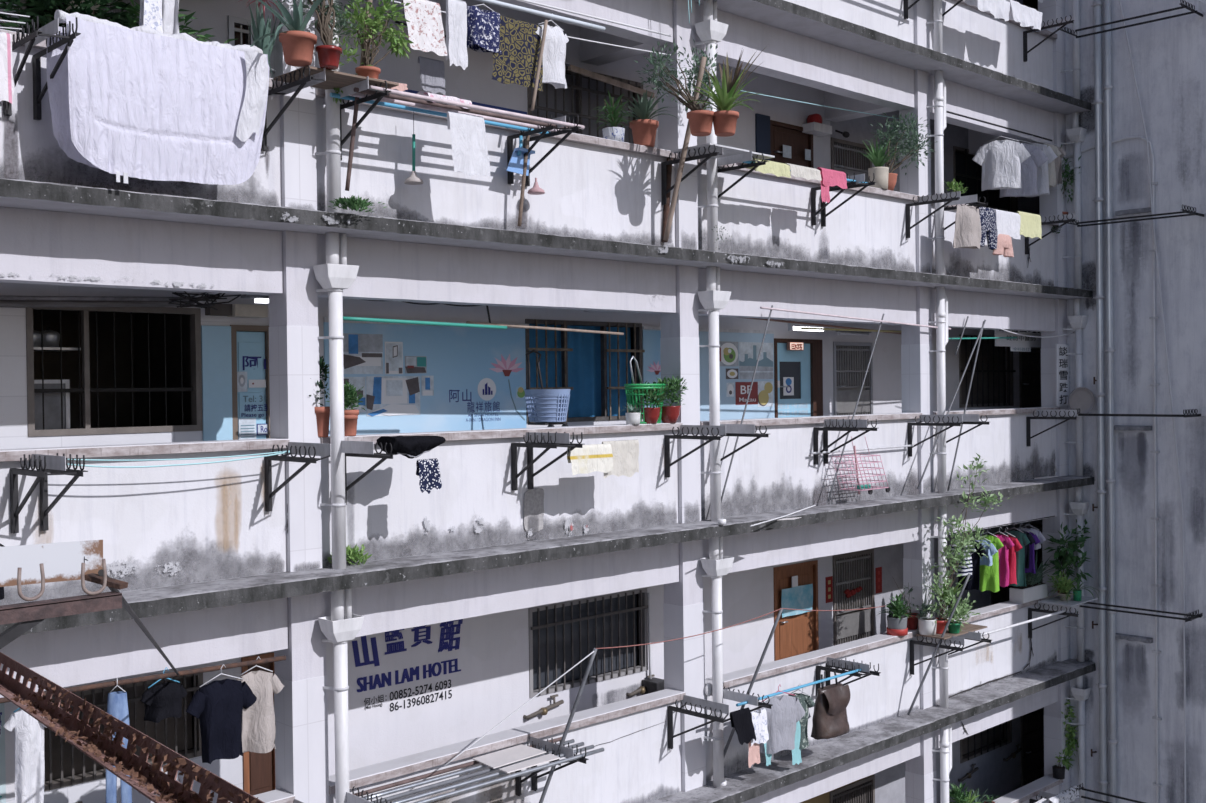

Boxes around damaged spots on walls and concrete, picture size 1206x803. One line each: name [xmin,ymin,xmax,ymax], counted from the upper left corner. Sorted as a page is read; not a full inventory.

leakage [0,117,277,206]
leakage [319,196,425,222]
leakage [475,205,1054,286]
leakage [0,453,1055,606]
corrosion [10,677,258,803]